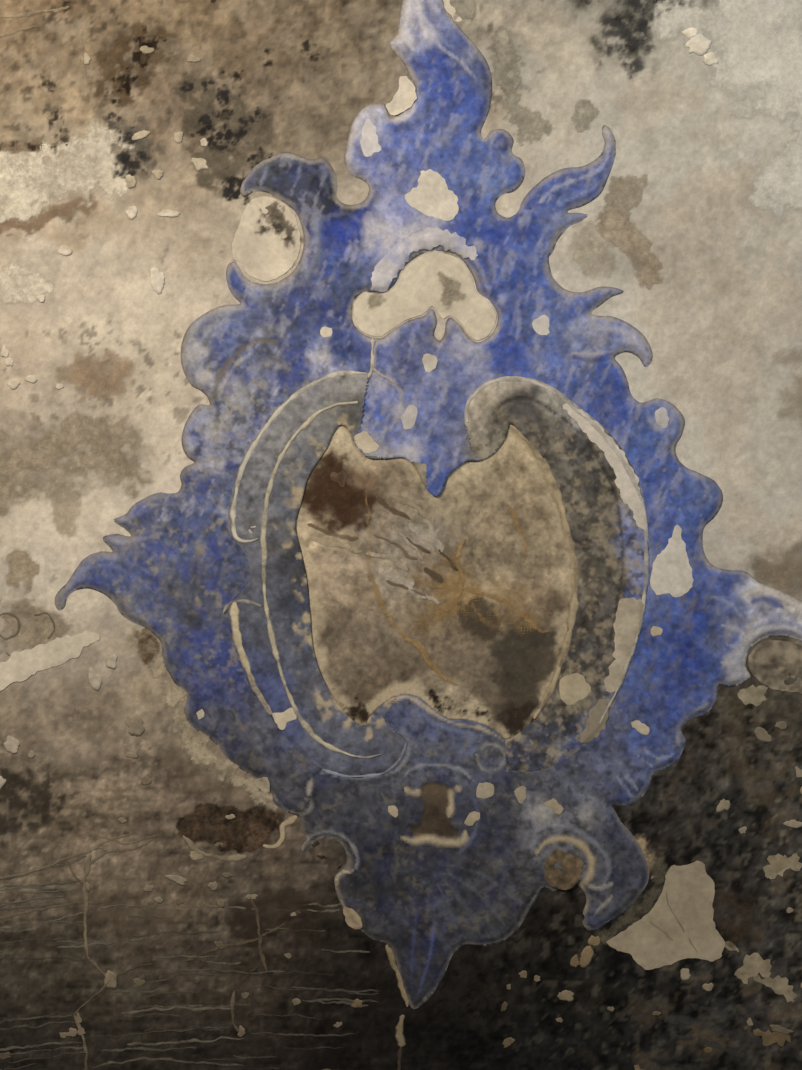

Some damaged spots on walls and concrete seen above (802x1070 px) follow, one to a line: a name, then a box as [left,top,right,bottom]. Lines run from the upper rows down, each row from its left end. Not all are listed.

damp [95,24,169,178]
damp [174,71,272,205]
damp [591,0,656,71]
peeling [232,196,301,281]
peeling [353,169,496,340]
damp [0,551,69,656]
peeling [559,597,663,743]
peeling [650,525,694,597]
damp [0,768,73,845]
spalling [125,627,297,908]
crack [0,840,409,1070]
spalling [570,837,802,1003]